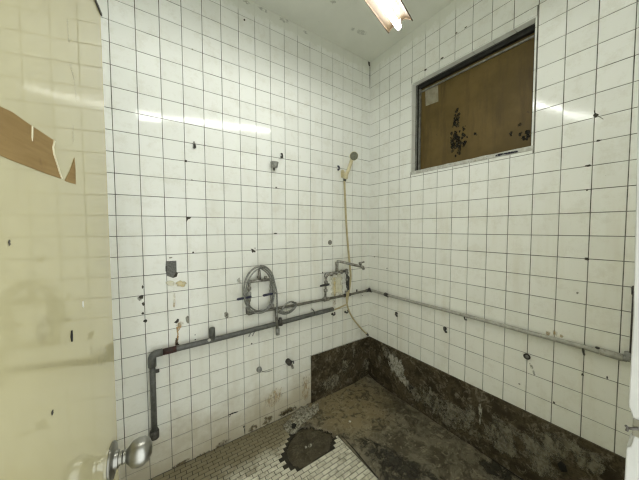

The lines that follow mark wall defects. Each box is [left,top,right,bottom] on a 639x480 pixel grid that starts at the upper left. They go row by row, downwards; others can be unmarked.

peeling [65,158,76,184]
spalling [165,257,178,278]
leakage [378,346,606,480]
leakage [358,437,442,480]